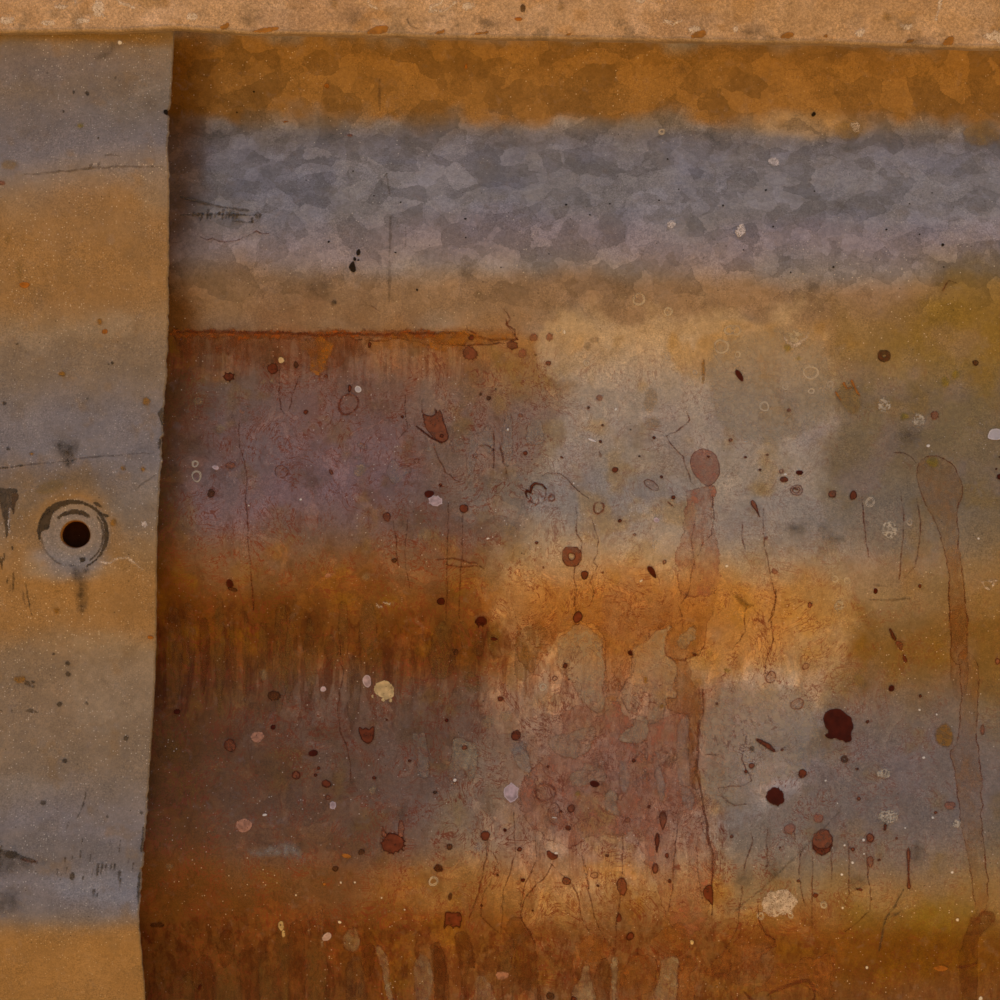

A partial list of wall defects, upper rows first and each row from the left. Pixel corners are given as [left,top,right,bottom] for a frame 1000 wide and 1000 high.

corrosion [169,321,553,377]
corrosion [416,409,449,444]
corrosion [524,482,555,503]
corrosion [779,469,803,495]
corrosion [647,449,720,578]
corrosion [562,547,588,580]
corrosion [823,709,853,742]
corrosion [517,653,717,937]
corrosion [766,787,784,806]
corrosion [380,820,406,855]
corrosion [812,814,833,856]
corrosion [443,893,462,929]